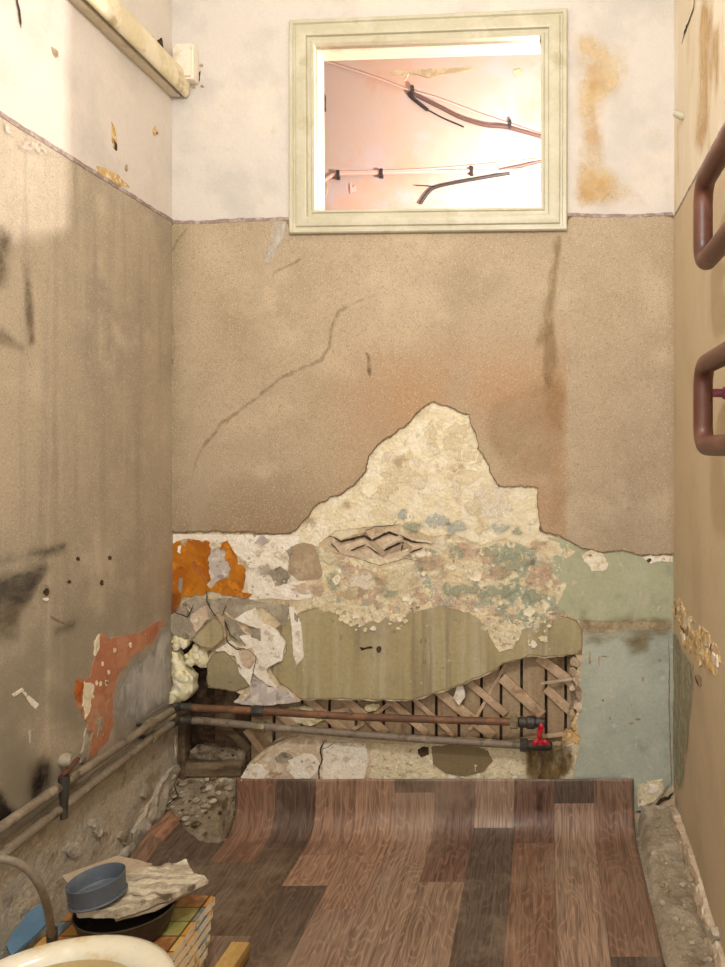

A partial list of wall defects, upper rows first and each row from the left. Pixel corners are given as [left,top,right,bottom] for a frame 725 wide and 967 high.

leakage [697,5,718,146]
peeling [96,164,130,188]
leakage [582,154,613,200]
peeling [643,555,673,564]
peeling [74,402,609,858]
spalling [673,597,721,687]